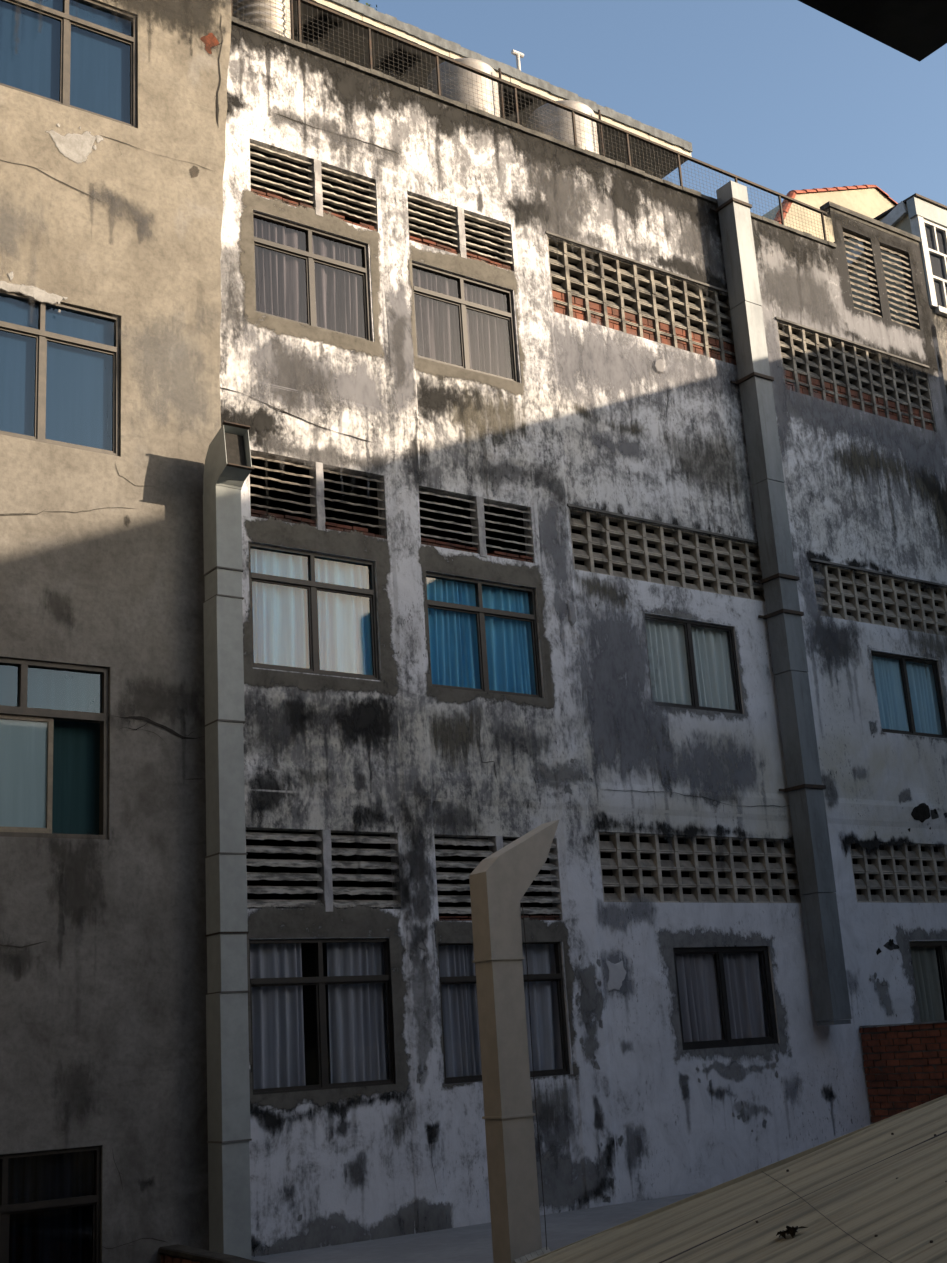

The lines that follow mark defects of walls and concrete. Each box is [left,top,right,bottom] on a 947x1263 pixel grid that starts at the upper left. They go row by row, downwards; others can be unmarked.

rust [200,33,219,54]
water stain [106,0,728,294]
peeling [0,272,68,312]
water stain [220,251,756,801]
water stain [796,551,895,670]
crack [116,716,204,743]
water stain [250,770,291,819]
water stain [395,782,480,955]
water stain [250,1091,406,1140]
water stain [346,1154,366,1186]
water stain [427,1122,439,1143]
water stain [578,1097,644,1208]